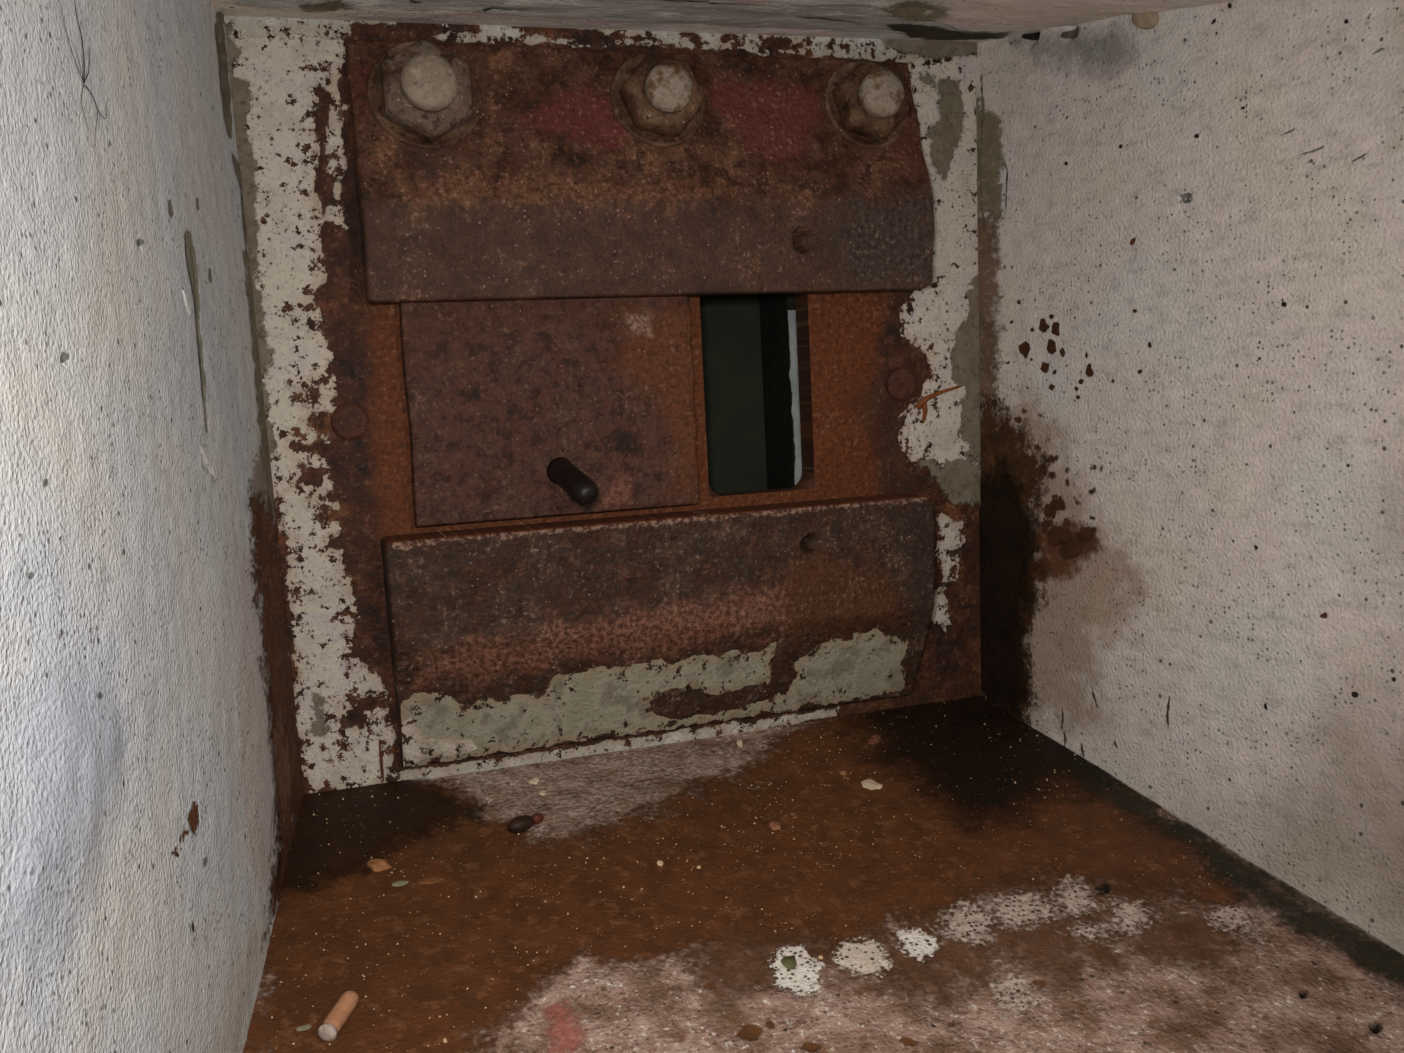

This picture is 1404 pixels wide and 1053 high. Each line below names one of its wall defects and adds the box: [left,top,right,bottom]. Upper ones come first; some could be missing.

peeling [224,0,979,795]
rust [1006,314,1065,391]
rust [1074,352,1093,399]
rust [979,393,1099,727]
rust [243,480,1280,1053]
rust [172,801,199,857]
leakage [865,695,1404,990]
leakage [767,875,1161,996]
leakage [990,972,1047,1018]